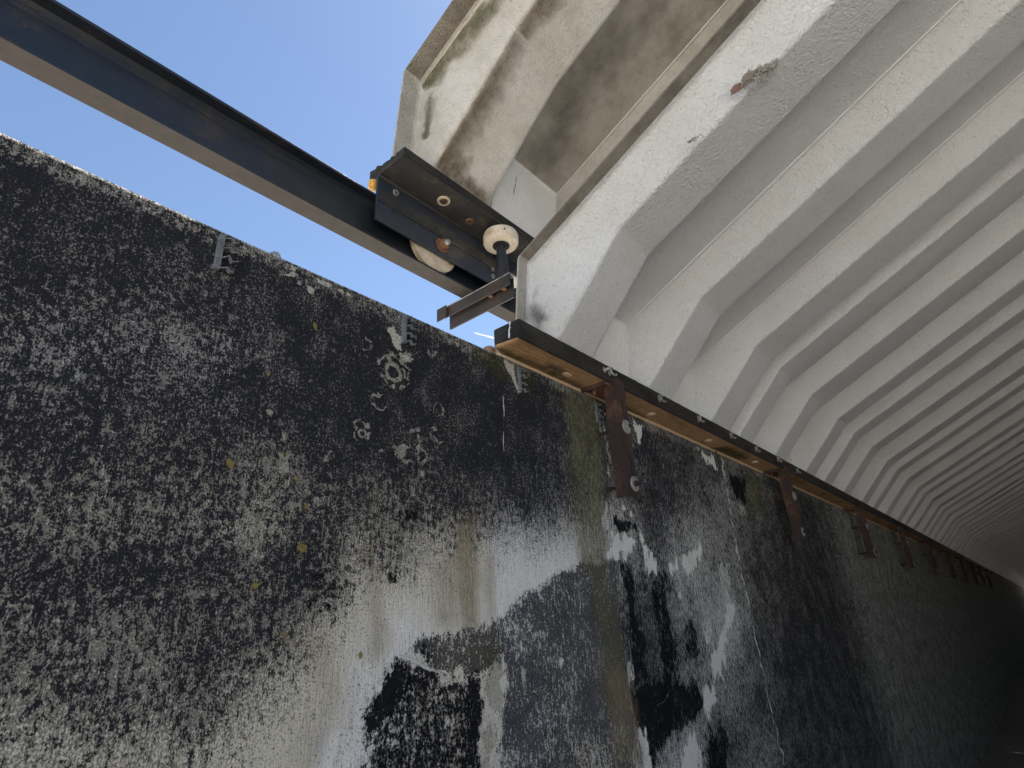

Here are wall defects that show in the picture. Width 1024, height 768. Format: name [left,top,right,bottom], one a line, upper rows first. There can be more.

leakage [449,39,516,152]
peeling [730,58,788,96]
leakage [531,305,544,323]
leakage [697,447,747,513]
leakage [303,568,348,622]
leakage [358,413,736,768]